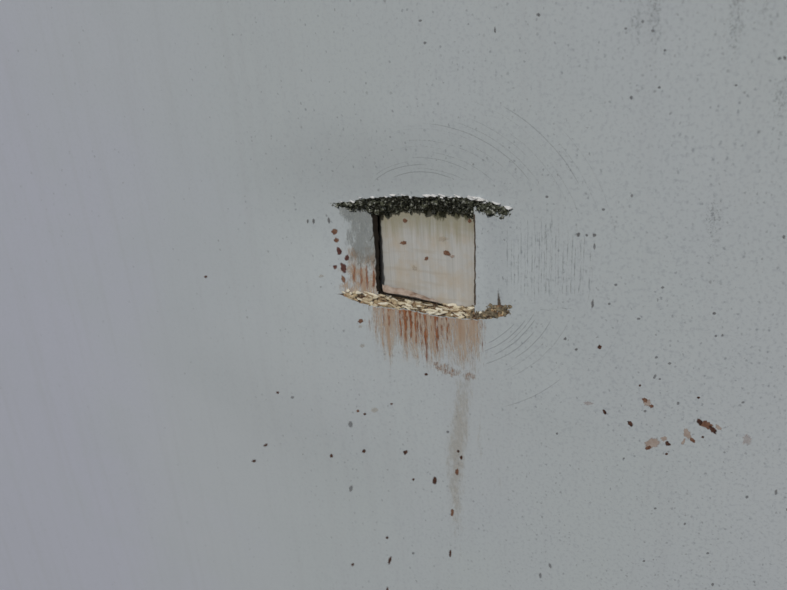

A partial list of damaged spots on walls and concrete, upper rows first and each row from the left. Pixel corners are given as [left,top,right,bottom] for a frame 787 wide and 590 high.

corrosion [331,229,377,295]
spalling [330,194,512,320]
corrosion [374,307,483,360]